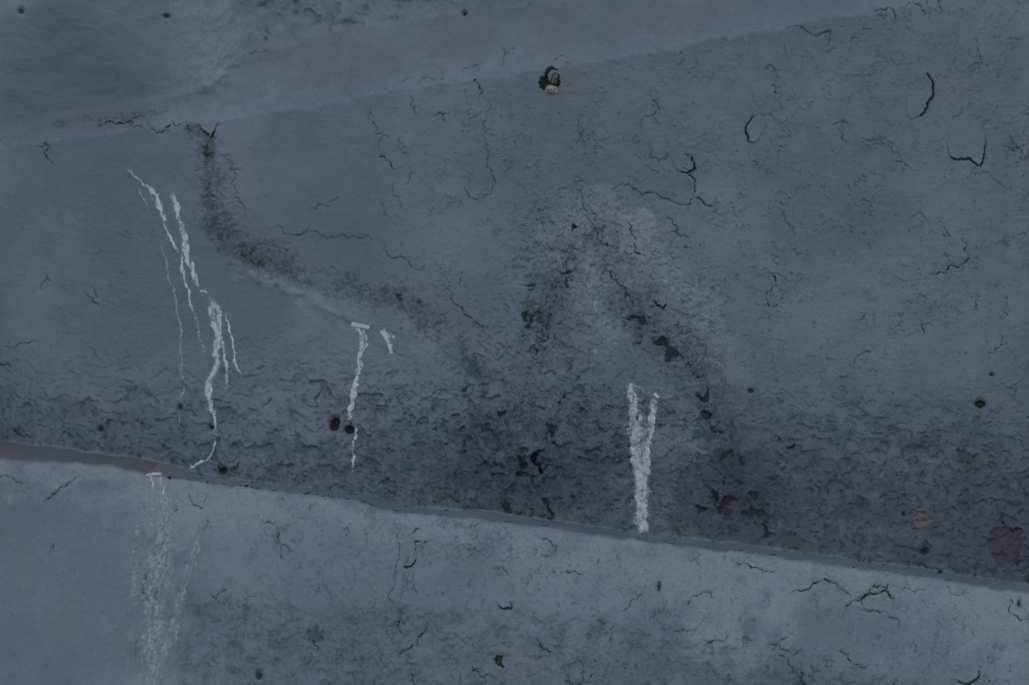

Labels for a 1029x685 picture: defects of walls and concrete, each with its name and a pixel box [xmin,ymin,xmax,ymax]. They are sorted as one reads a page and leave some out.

crack [97,115,245,216]
crack [401,45,514,200]
spalling [538,66,560,94]
crack [615,100,718,238]
crack [565,197,641,306]
efflorescence [130,472,201,685]
leakage [127,170,242,472]
efflorescence [347,322,394,471]
leakage [626,383,659,534]
leakage [622,301,725,378]
leakage [695,478,776,541]
crack [792,562,964,646]